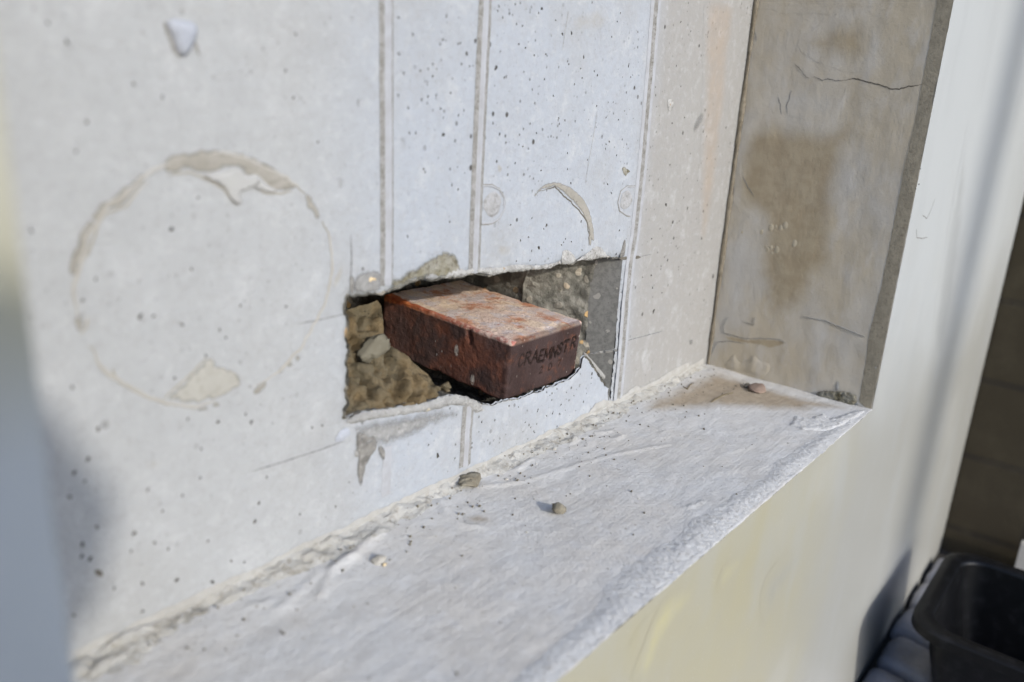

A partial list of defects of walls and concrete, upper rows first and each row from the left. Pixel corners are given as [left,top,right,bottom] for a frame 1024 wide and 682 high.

leakage [713,0,890,323]
crack [778,64,921,115]
spalling [335,183,618,483]